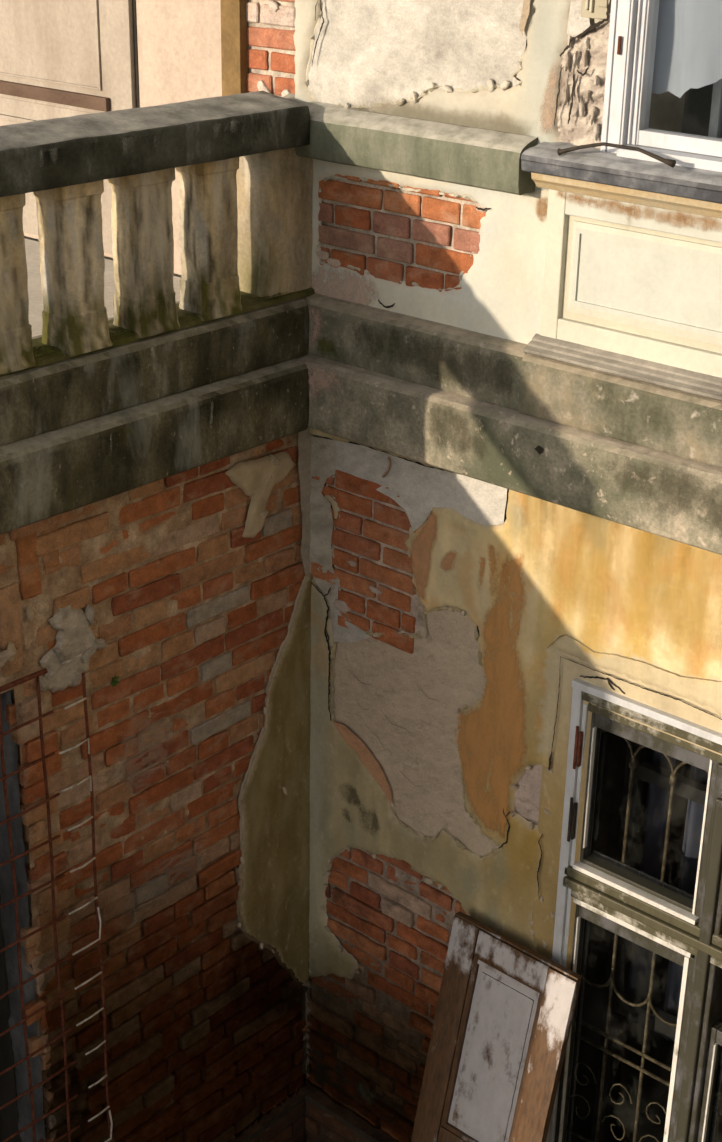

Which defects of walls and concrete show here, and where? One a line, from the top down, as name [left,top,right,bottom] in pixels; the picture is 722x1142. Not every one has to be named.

crack [312,0,324,65]
spalling [246,0,535,109]
spalling [565,0,600,141]
flaking render [315,174,487,292]
crack [310,581,331,720]
spalling [237,436,507,958]
crack [548,656,722,771]
crack [499,809,510,849]
flaking render [309,845,467,1047]